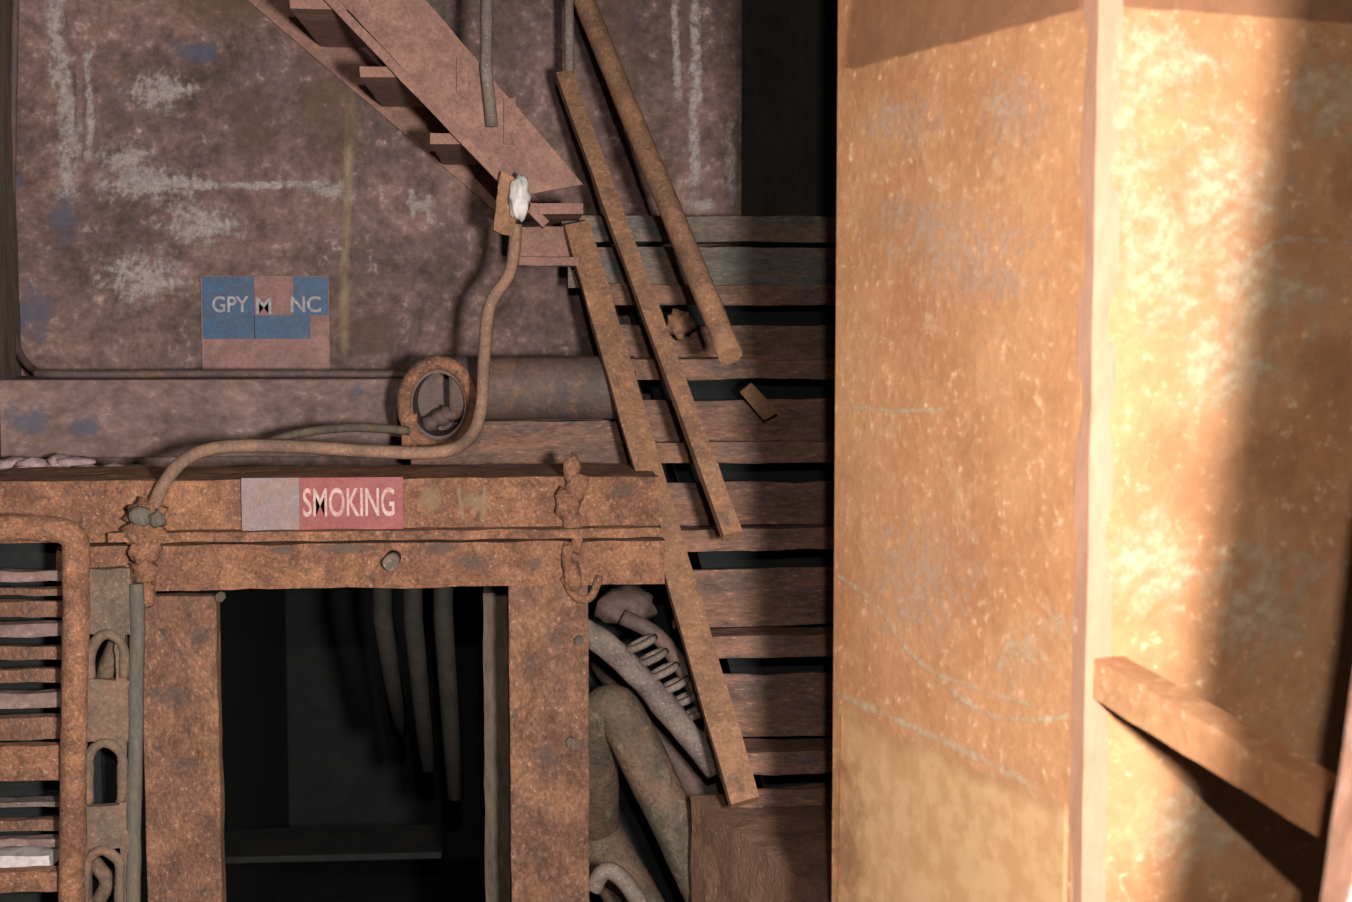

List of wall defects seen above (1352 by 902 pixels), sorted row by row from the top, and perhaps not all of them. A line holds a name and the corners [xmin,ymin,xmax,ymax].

corrosion [1320,684,1352,902]